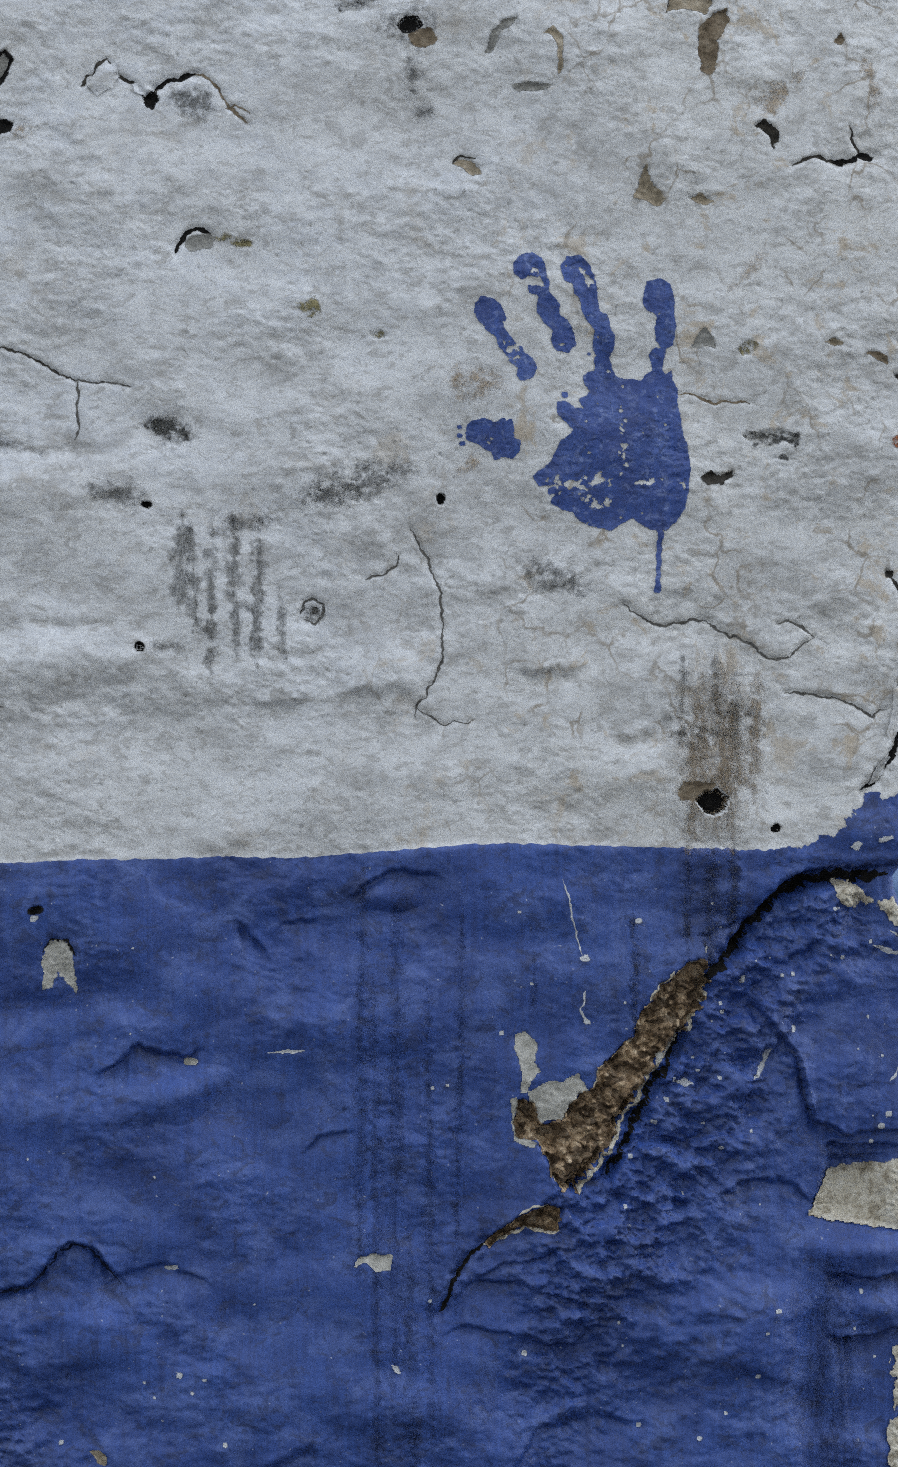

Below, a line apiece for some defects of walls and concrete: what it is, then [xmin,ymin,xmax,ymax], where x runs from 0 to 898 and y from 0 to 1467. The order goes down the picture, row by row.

flaking render [666,0,730,75]
crack [0,346,131,440]
damp [170,515,287,663]
crack [366,529,472,726]
crack [623,604,885,718]
crack [885,571,898,590]
spalling [829,878,898,955]
peeling [41,938,78,993]
spalling [483,946,712,1248]
spalling [809,1158,898,1229]
crack [1,1244,121,1293]
spalling [887,1345,898,1467]